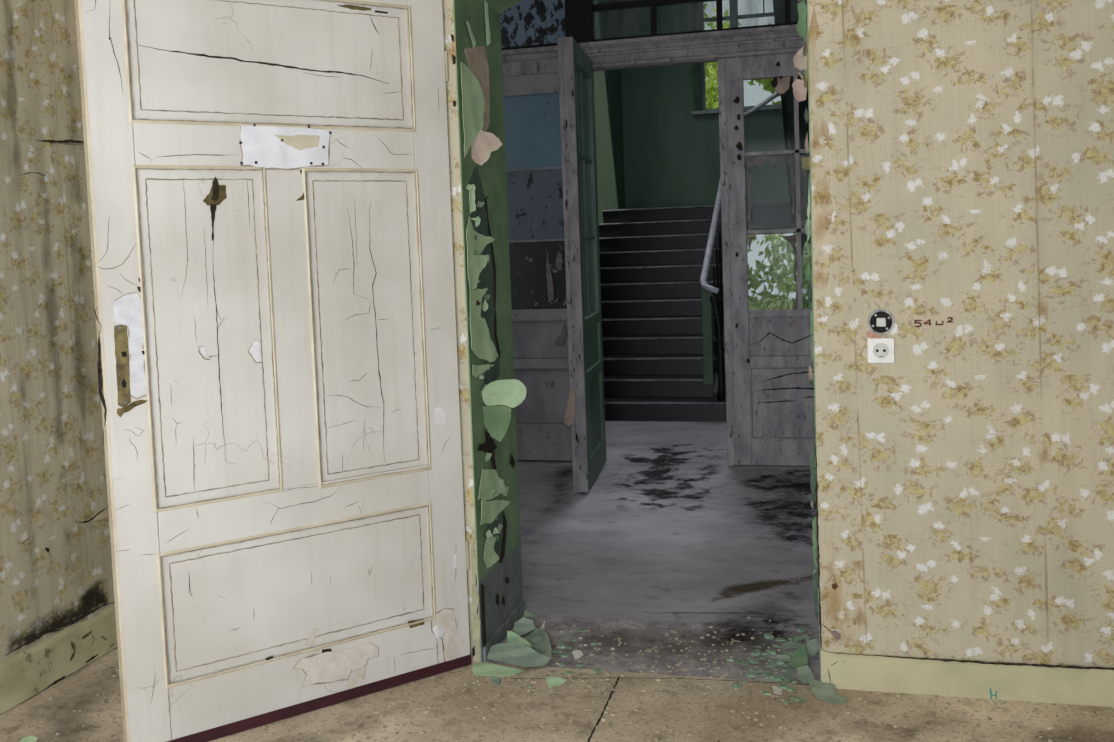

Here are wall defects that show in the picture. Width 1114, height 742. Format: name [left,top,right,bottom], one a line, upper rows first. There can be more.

peeling [771,0,810,175]
peeling [733,96,743,160]
peeling [546,249,575,304]
peeling [408,0,526,671]
peeling [805,263,813,385]
leakage [618,444,714,510]
leakage [748,470,816,544]
leakage [11,583,107,649]
peeling [504,621,532,648]